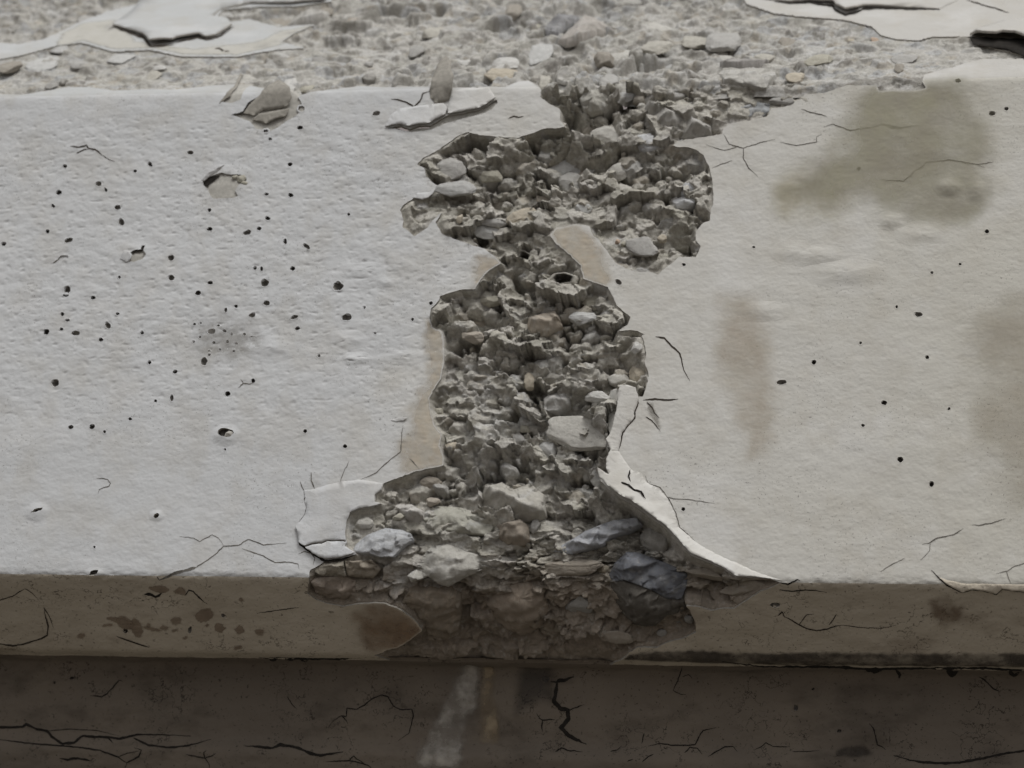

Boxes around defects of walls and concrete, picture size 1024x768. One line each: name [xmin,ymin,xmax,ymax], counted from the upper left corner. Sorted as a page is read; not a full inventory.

spalling [0,0,1024,132]
peeling [202,165,247,199]
crack [706,109,859,177]
leakage [812,87,974,213]
spalling [295,81,787,662]
crack [619,336,690,448]
crack [144,535,327,604]
crack [778,579,895,631]
crack [0,723,216,768]
crack [245,743,371,768]
crack [537,676,586,752]
crack [871,726,1024,765]